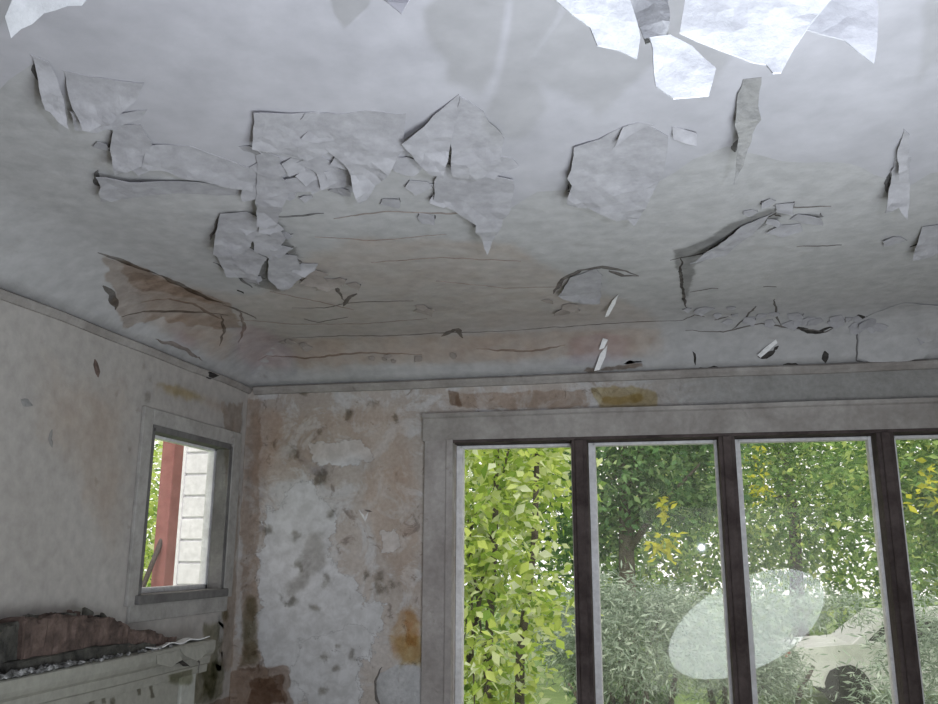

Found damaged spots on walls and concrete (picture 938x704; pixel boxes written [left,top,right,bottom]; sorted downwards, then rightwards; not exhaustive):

peeling [0,0,938,320]
crack [773,205,831,217]
crack [296,286,867,338]
peeling [594,338,608,371]
peeling [308,439,374,468]
peeling [379,529,401,553]
peeling [248,474,388,704]